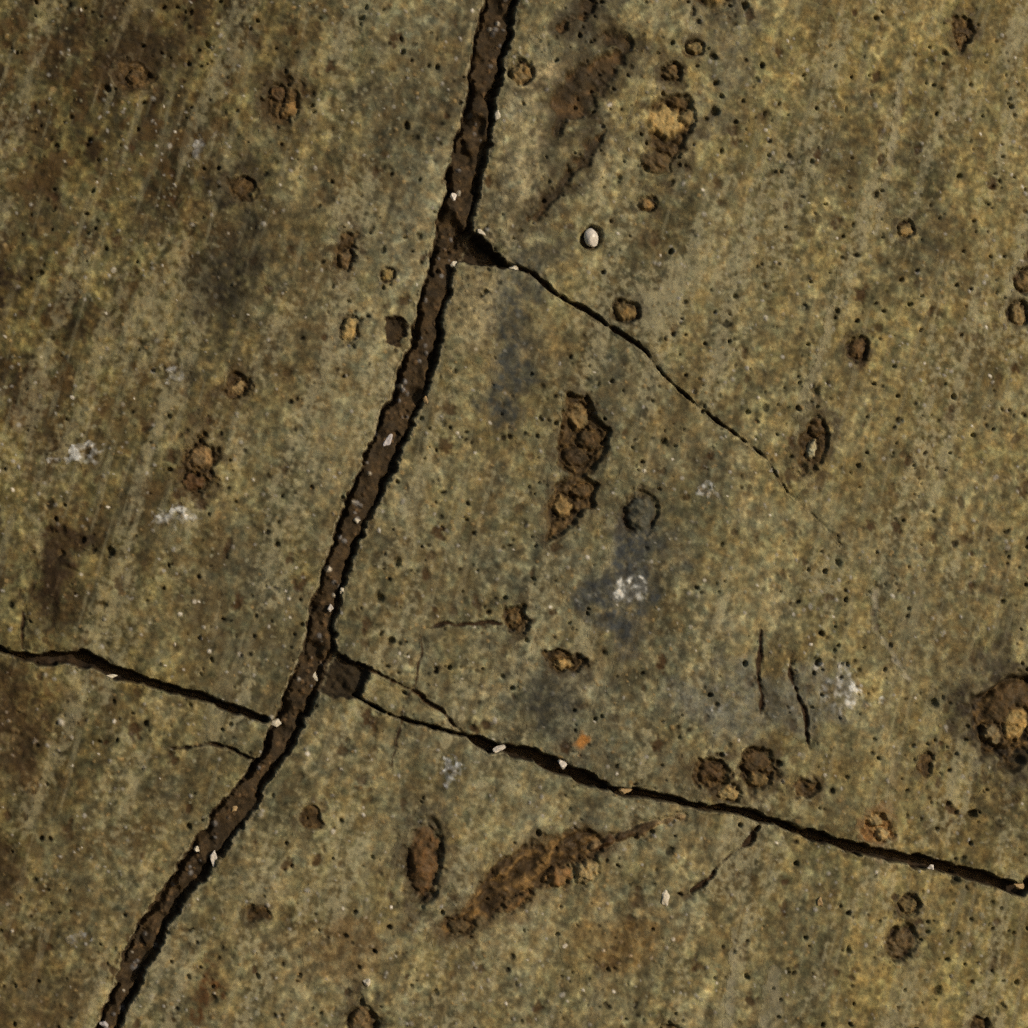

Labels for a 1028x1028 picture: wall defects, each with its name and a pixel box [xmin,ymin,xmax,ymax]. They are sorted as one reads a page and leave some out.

spalling [443,0,747,387]
flaking render [999,219,1028,336]
crack [0,0,522,1028]
spalling [532,382,678,553]
crack [461,231,844,548]
crack [389,629,1028,900]
spalling [681,733,832,809]
spalling [911,742,942,790]
spalling [944,626,1028,795]
spalling [386,805,689,952]